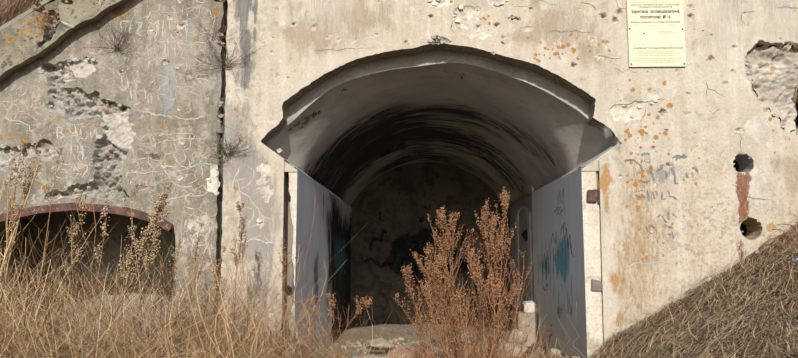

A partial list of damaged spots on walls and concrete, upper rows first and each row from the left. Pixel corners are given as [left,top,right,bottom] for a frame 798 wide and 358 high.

spalling [421,35,455,45]
spalling [427,0,533,54]
spalling [38,56,136,204]
spalling [610,89,669,123]
spalling [722,40,798,136]
spalling [0,138,62,183]
rust [736,173,752,224]